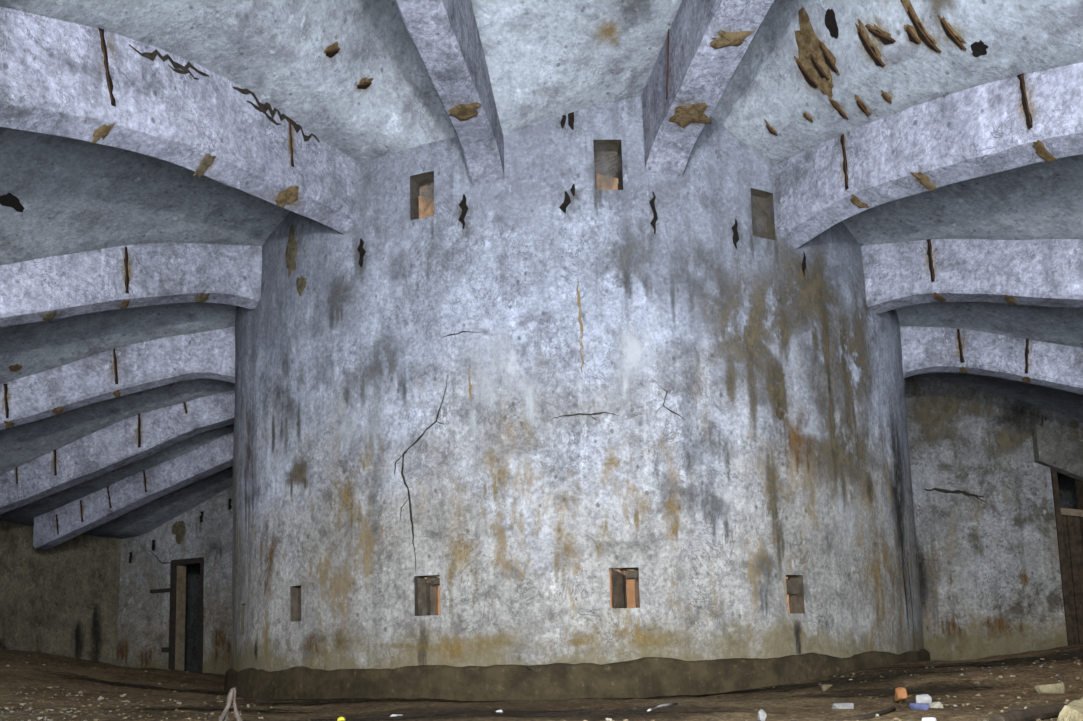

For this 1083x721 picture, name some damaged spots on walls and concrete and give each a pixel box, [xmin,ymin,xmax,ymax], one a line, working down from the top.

corrosion [98,28,116,107]
spalling [794,7,849,120]
corrosion [1017,73,1032,130]
spalling [458,194,468,229]
spalling [559,184,578,213]
spalling [649,192,658,234]
corrosion [840,134,869,208]
water stain [716,245,873,535]
crack [394,376,448,572]
water stain [760,463,784,607]
water stain [893,440,926,617]
crack [924,488,988,504]